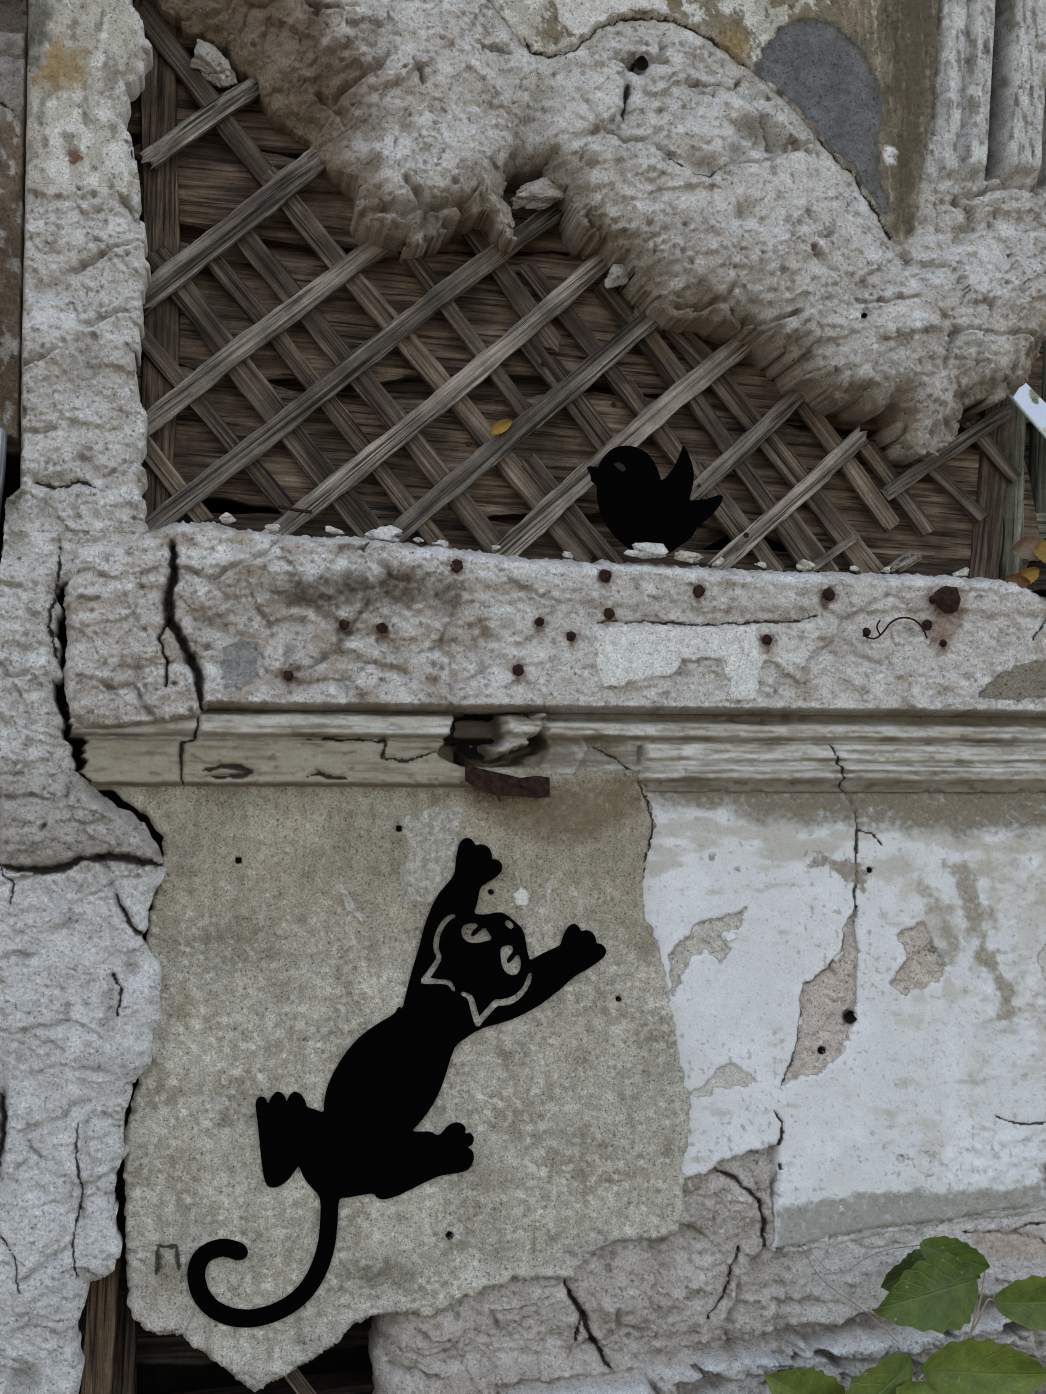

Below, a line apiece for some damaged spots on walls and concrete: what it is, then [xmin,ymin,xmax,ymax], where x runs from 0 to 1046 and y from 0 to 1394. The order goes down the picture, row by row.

crack [47,546,62,659]
crack [828,744,882,909]
spalling [668,907,747,995]
spalling [782,908,859,1085]
spalling [890,921,946,996]
crack [775,939,844,1170]
crack [996,1115,1046,1125]
crack [706,1169,1046,1319]
crack [564,1281,613,1370]